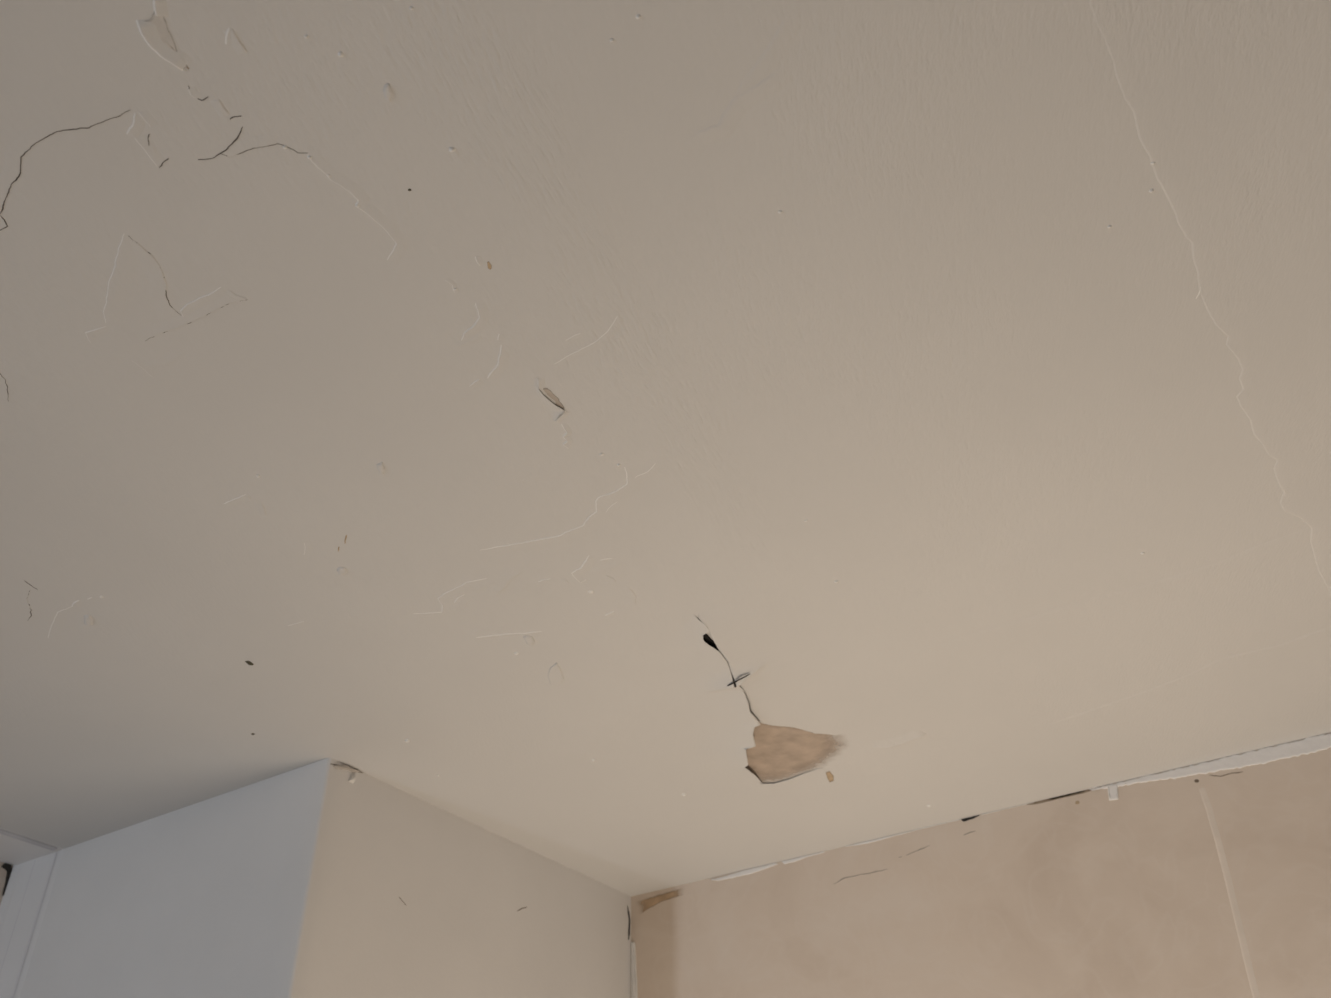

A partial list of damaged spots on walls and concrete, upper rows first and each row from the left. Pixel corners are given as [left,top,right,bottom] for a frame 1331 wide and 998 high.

crack [0,99,169,231]
peeling [531,378,573,448]
peeling [666,604,879,796]